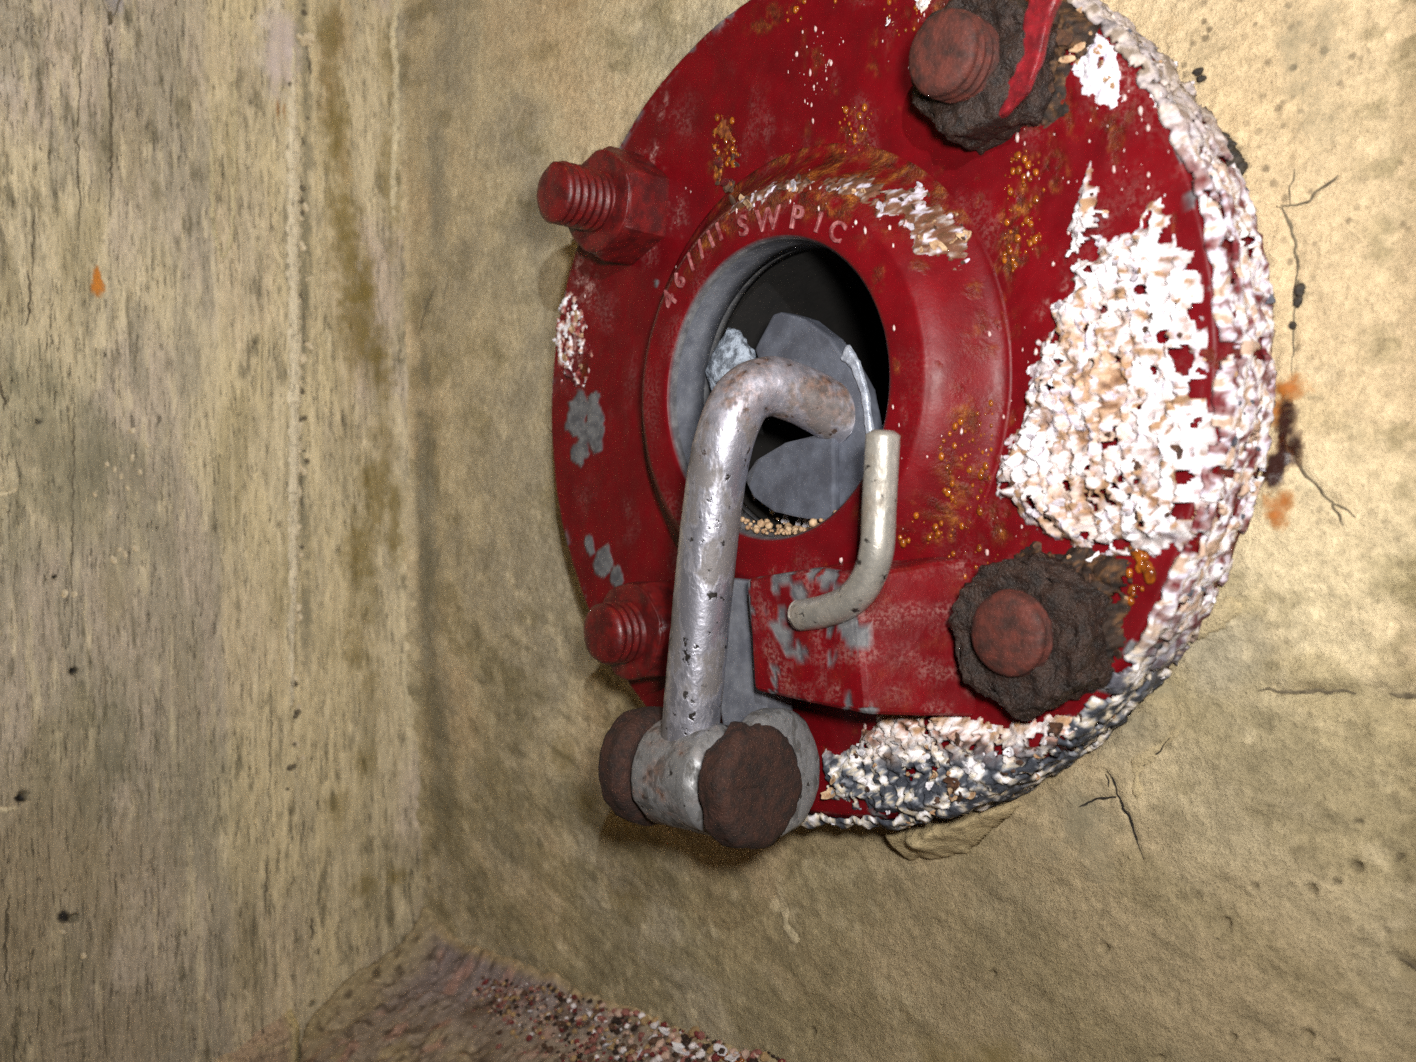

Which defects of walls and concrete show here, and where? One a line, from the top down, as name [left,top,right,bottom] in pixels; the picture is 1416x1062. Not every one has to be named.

crack [1276,169,1339,379]
crack [1293,456,1356,526]